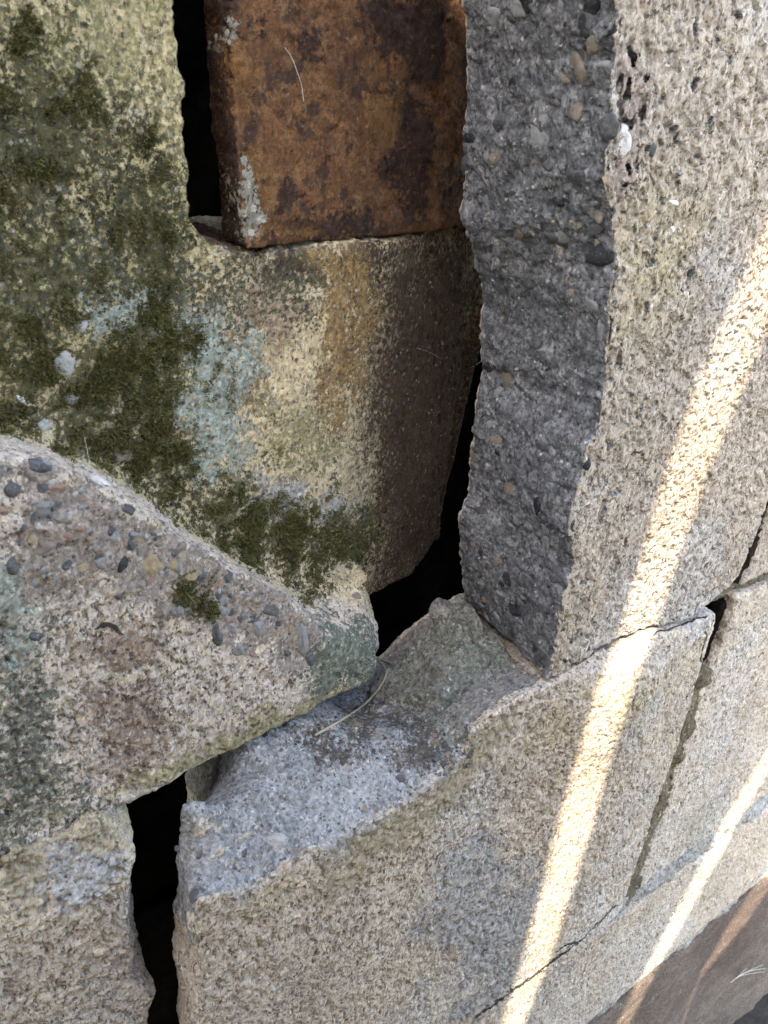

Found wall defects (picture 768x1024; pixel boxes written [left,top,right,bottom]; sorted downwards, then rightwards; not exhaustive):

corrosion [189,0,484,594]
leakage [249,468,372,531]
crack [473,905,617,1019]